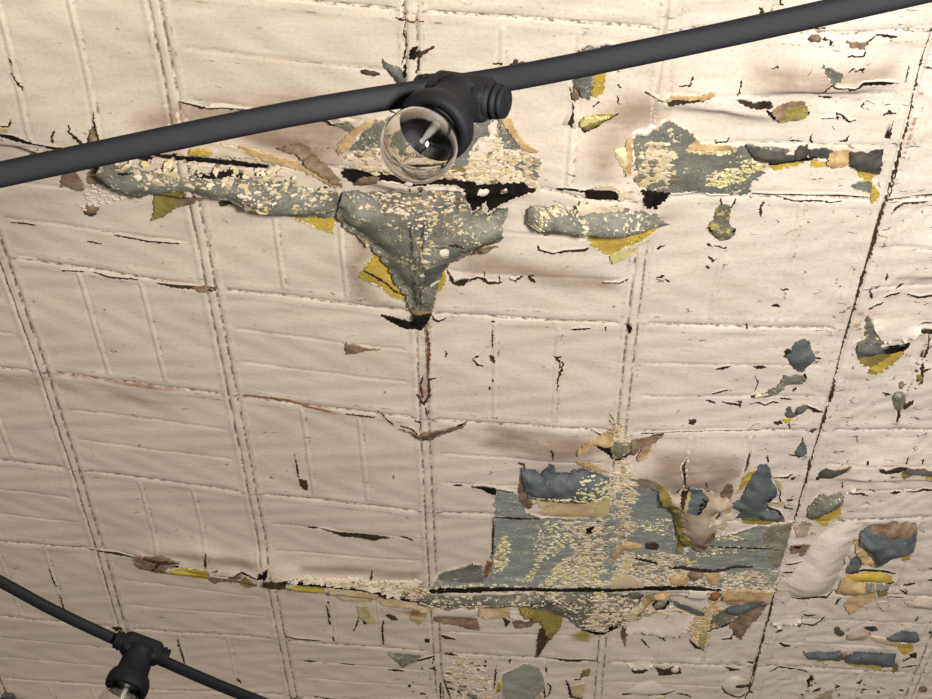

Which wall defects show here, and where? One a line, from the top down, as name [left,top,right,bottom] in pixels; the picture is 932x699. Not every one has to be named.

peeling [181,99,257,110]
peeling [561,73,622,133]
peeling [60,111,542,331]
peeling [527,117,884,269]
peeling [850,283,932,423]
peeling [376,411,467,441]
crack [88,548,179,571]
crack [204,552,258,580]
peeling [290,418,870,699]
peeling [835,521,918,615]
crack [282,571,721,645]
peeling [803,617,932,673]